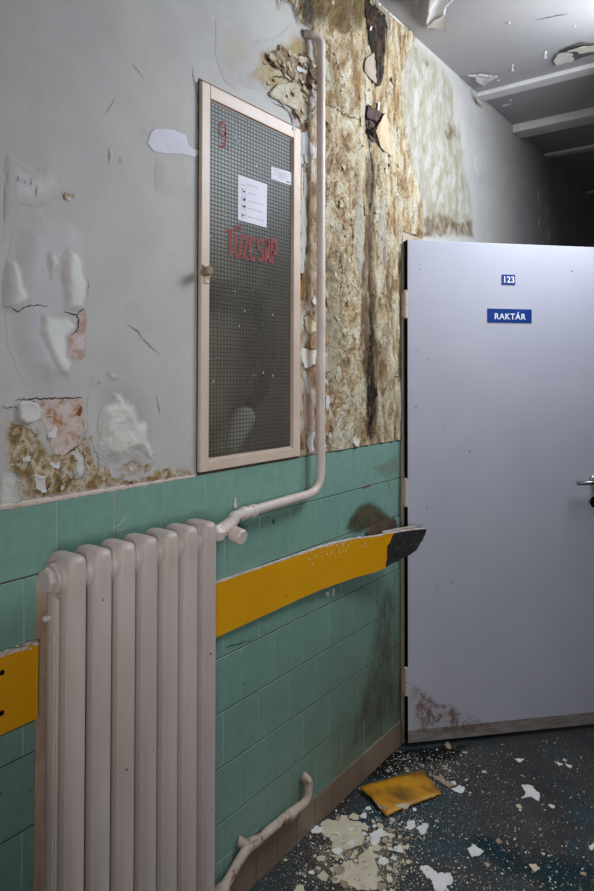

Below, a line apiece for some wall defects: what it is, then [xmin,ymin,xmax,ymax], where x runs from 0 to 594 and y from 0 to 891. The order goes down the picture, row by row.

peeling [426,0,453,33]
water stain [215,0,363,128]
peeling [468,73,500,87]
peeling [544,42,594,66]
water stain [401,37,476,242]
peeling [263,0,424,457]
water stain [357,141,388,439]
spalling [2,397,85,470]
peeling [34,474,49,496]
rust [416,693,476,731]